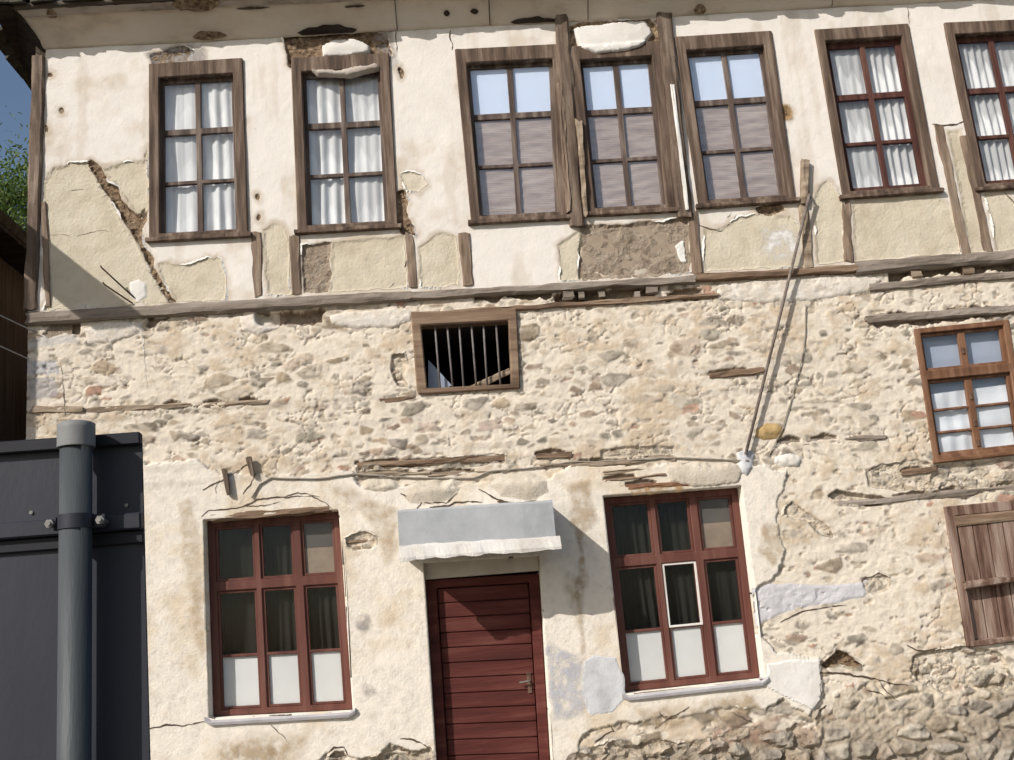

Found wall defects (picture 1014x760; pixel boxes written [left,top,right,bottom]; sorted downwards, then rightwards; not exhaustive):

flaking render [42,149,229,312]
flaking render [257,170,461,298]
flaking render [558,205,804,283]
flaking render [813,131,1014,265]
crack [201,464,330,517]
flaking render [343,530,378,551]
flaking render [326,746,436,760]
flaking render [567,725,823,760]